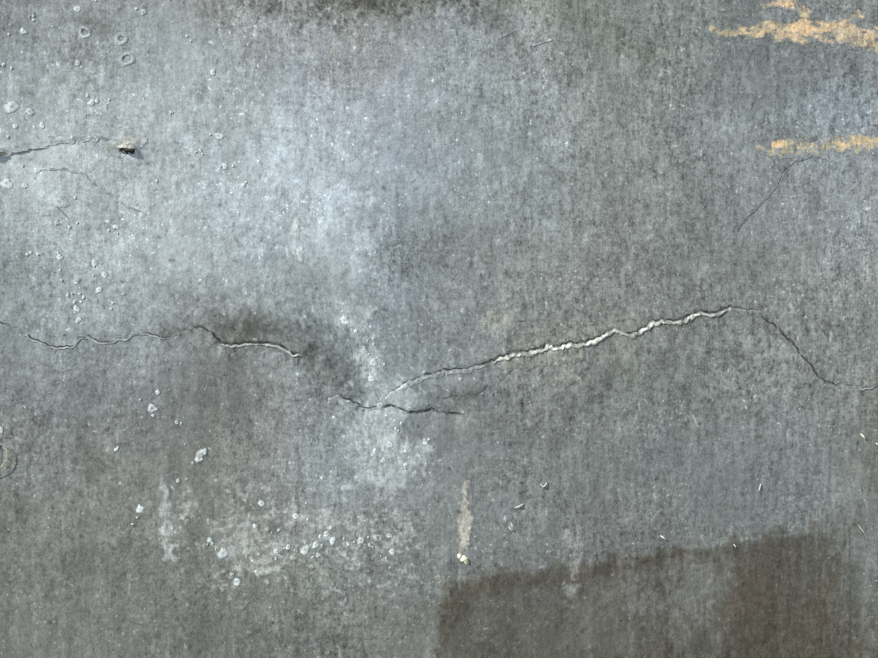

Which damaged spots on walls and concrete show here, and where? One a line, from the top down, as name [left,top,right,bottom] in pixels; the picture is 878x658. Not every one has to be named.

peeling [759,0,815,18]
peeling [770,136,789,150]
peeling [834,134,878,152]
crack [0,134,143,212]
crack [0,321,302,357]
crack [327,305,878,414]
water stain [125,271,878,658]